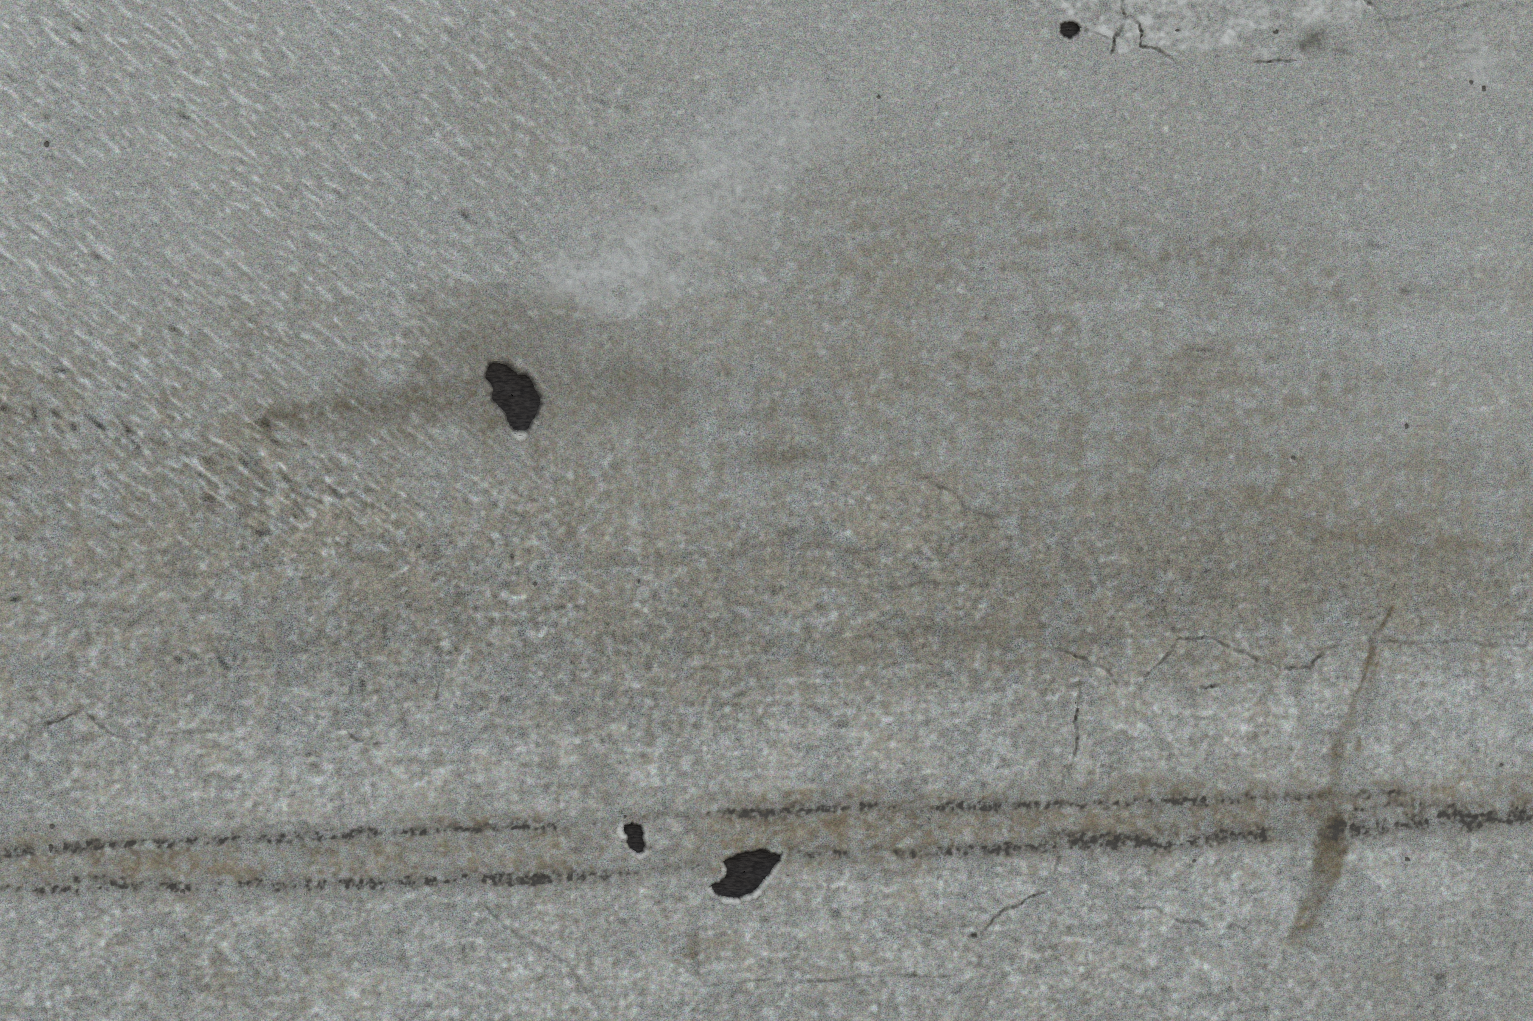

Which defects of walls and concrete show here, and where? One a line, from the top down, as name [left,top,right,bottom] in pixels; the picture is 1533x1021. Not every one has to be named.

crack [1080,0,1184,69]
crack [1252,57,1297,65]
crack [1050,601,1533,789]
leakage [920,601,1533,952]
leakage [106,814,470,852]
leakage [1,836,716,910]
crack [682,854,1062,1021]